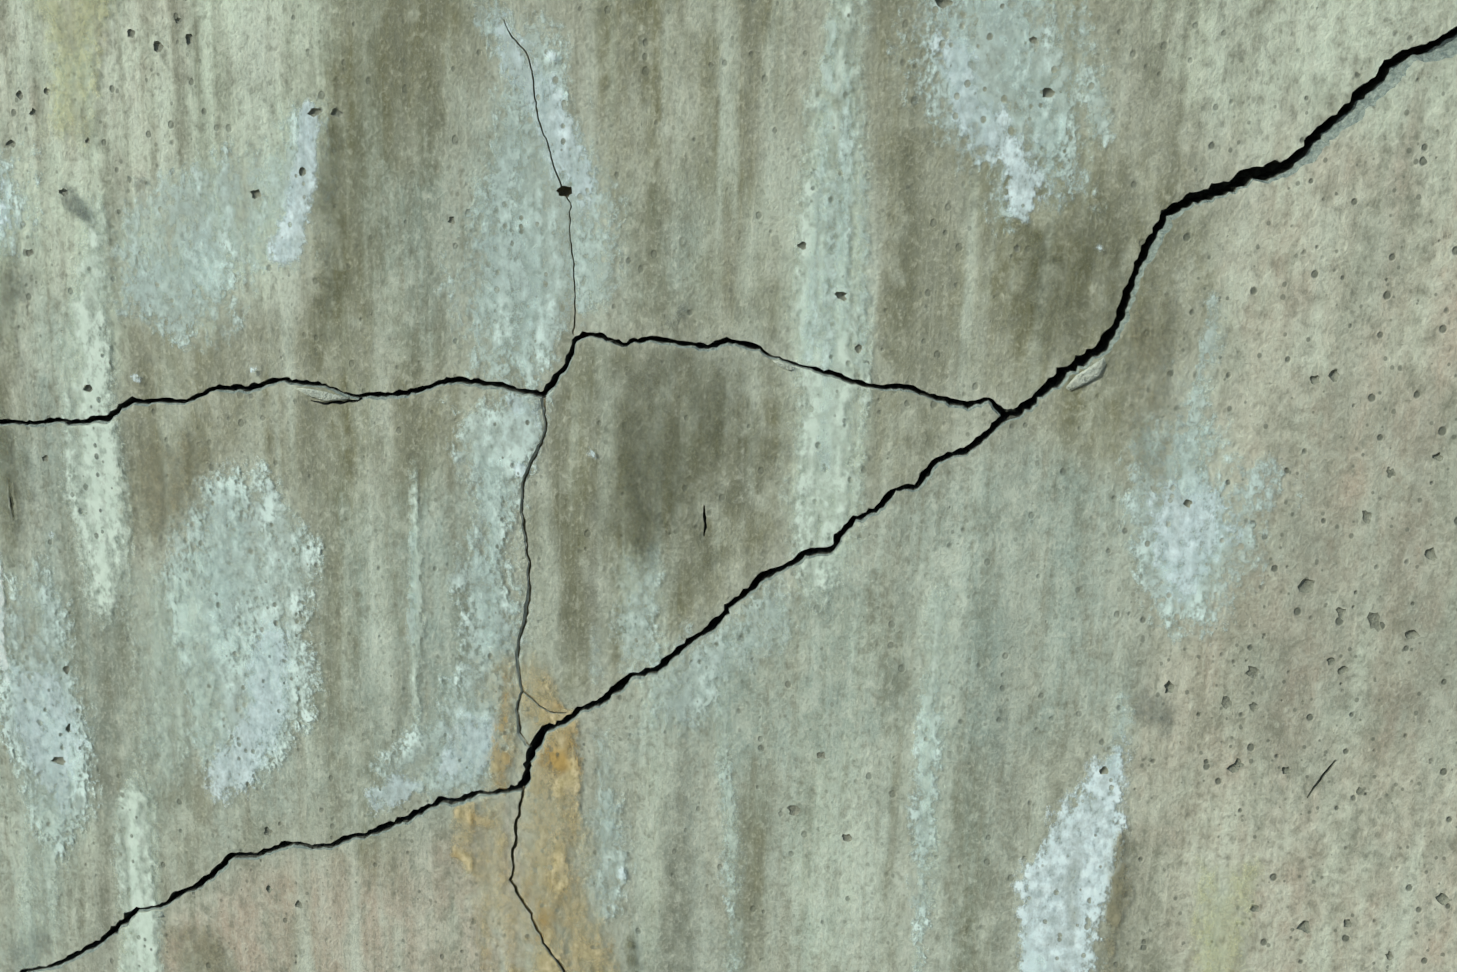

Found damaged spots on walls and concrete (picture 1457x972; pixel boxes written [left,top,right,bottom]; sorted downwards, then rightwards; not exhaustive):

crack [504,20,575,272]
water stain [888,0,1114,272]
crack [0,331,1015,427]
crack [570,277,578,335]
crack [902,35,1457,492]
crack [515,398,566,748]
crack [729,494,895,609]
crack [531,623,721,765]
efflorescence [115,779,162,972]
crack [195,793,502,891]
crack [509,786,567,972]
water stain [1014,709,1129,972]